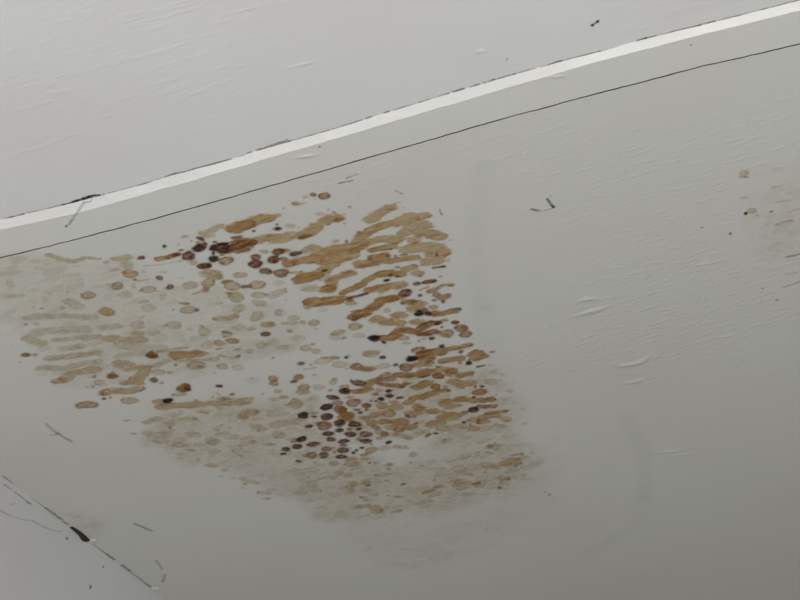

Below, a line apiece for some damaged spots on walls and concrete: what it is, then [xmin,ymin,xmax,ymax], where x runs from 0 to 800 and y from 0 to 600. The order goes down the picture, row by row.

leakage [76,350,208,408]
leakage [111,205,508,464]